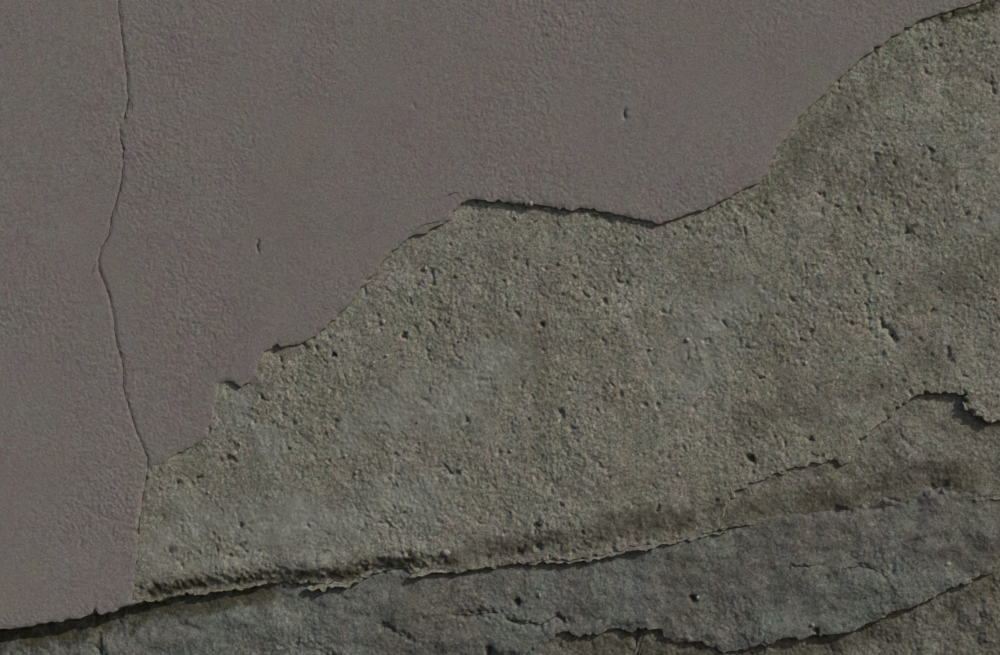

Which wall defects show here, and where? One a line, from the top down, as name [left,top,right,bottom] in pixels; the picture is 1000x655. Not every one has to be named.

crack [93,9,149,598]
spalling [717,391,1000,531]
spalling [528,531,726,566]
spalling [193,581,267,596]
spalling [307,578,363,592]
spalling [409,570,450,578]
spalling [540,557,1000,655]
crack [844,565,890,578]